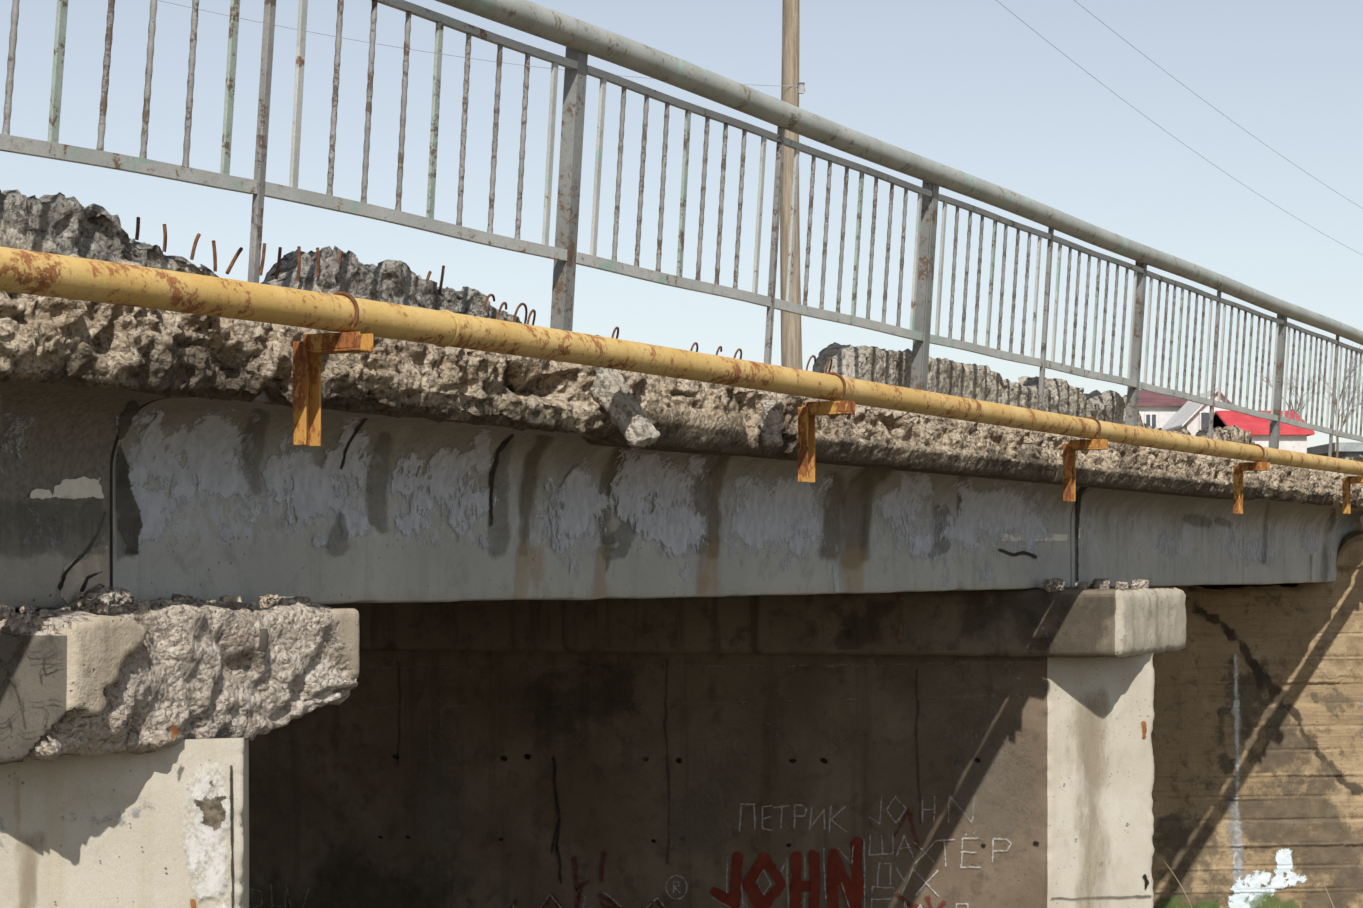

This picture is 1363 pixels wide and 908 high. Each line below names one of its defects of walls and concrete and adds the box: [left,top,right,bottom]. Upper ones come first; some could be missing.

peeling [116,402,503,559]
crack [340,418,368,469]
leakage [521,435,550,554]
leakage [601,447,627,568]
leakage [708,456,729,557]
leakage [821,468,888,567]
crack [0,632,63,735]
spalling [194,780,226,830]
crack [551,757,562,884]